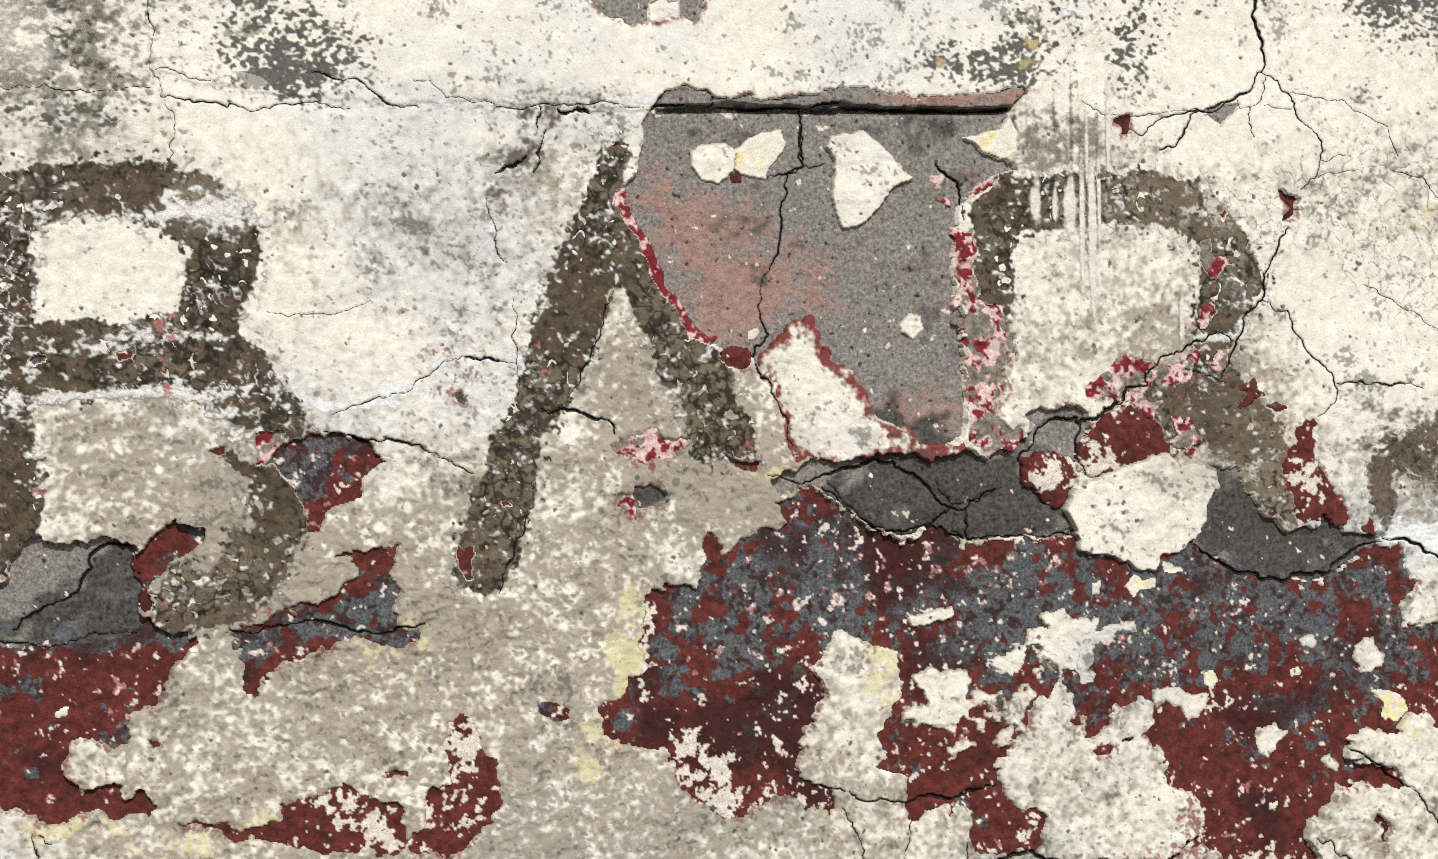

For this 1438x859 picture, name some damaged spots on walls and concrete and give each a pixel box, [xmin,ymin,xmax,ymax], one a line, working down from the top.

spalling [591,0,704,25]
crack [1089,0,1438,198]
crack [0,0,1068,541]
crack [1017,228,1422,474]
peeling [255,430,383,532]
peeling [598,86,1438,859]
peeling [0,519,205,825]
peeling [226,544,430,698]
crack [1194,537,1438,583]
peeling [180,713,503,859]
crack [825,785,996,859]
crack [1350,749,1438,823]